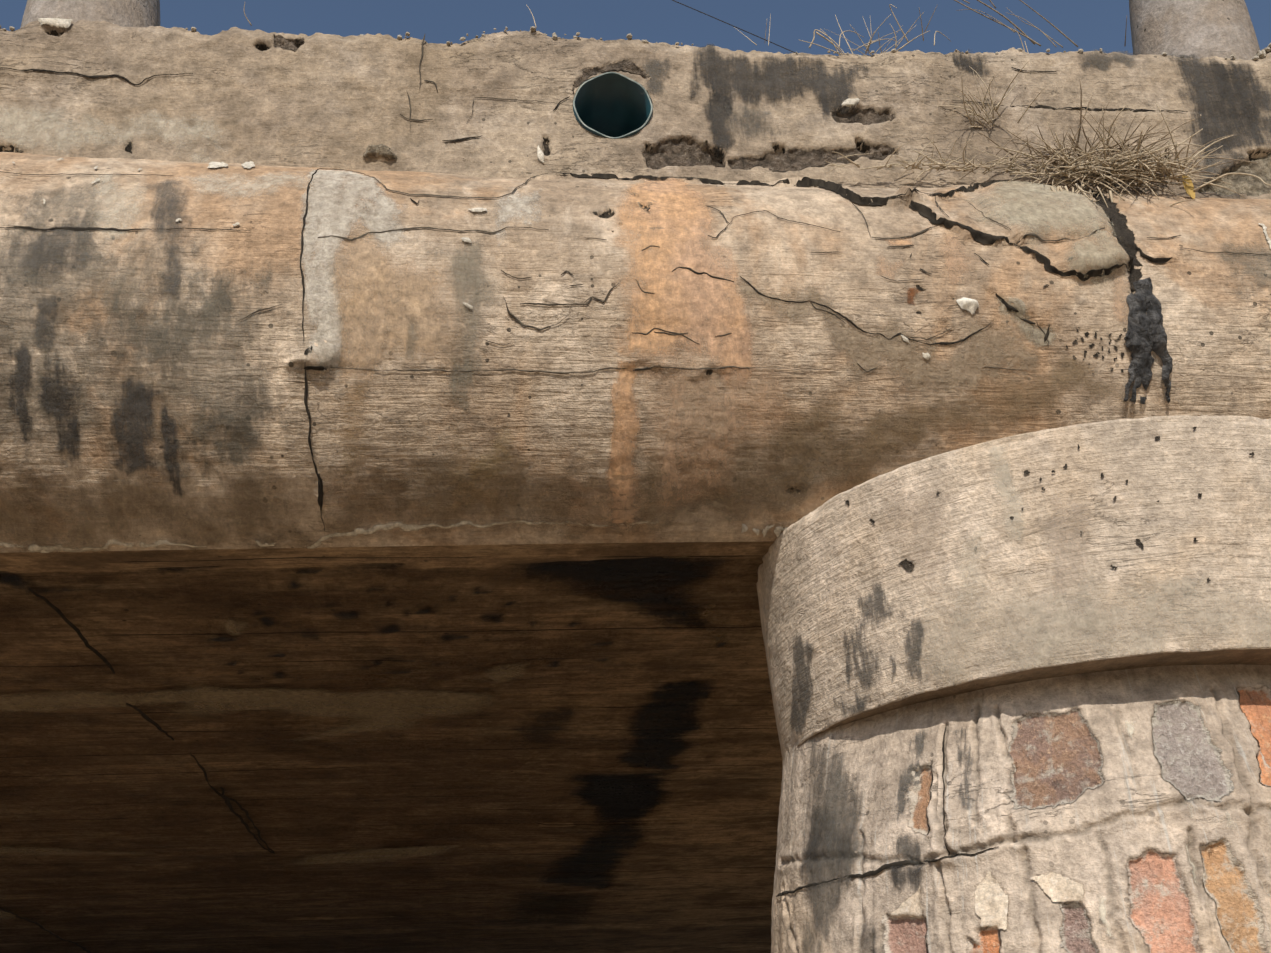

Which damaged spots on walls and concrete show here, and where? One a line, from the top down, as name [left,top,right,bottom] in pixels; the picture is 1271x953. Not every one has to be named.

crack [0,169,174,177]
leakage [691,44,868,163]
leakage [1172,54,1271,197]
leakage [9,297,88,456]
rust [593,179,752,529]
crack [238,168,1271,531]
leakage [112,379,182,495]
crack [776,727,999,897]
peeling [1008,707,1104,810]
peeling [1237,686,1271,786]
peeling [966,871,1008,953]
peeling [1200,838,1268,953]